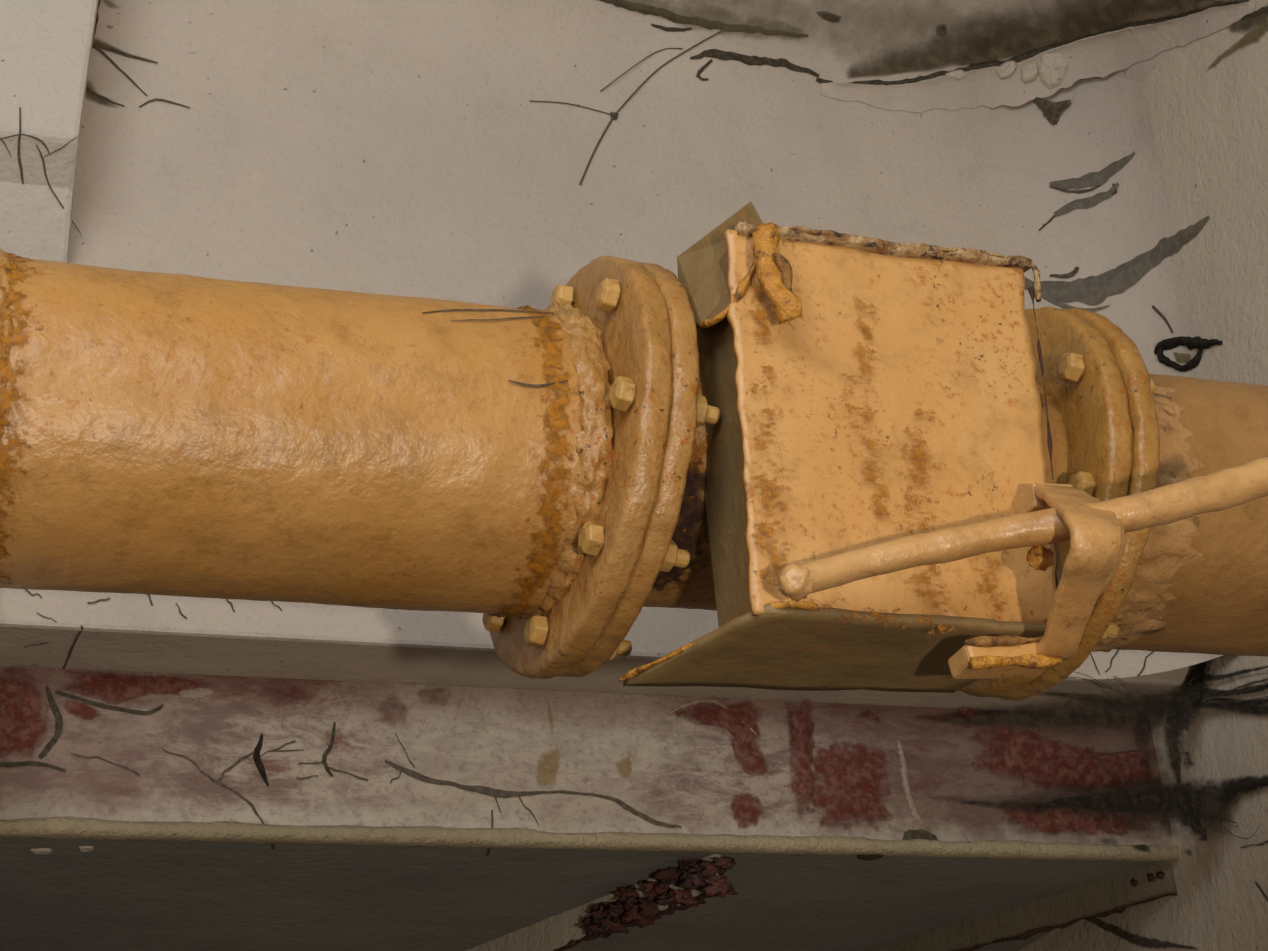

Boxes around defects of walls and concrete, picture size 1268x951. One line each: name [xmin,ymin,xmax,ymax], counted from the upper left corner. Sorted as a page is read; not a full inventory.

crack [600,0,819,81]
damp [1209,6,1268,68]
crack [0,107,82,235]
crack [147,594,187,619]
crack [0,589,164,776]
crack [161,722,682,856]
corrosion [553,857,738,951]